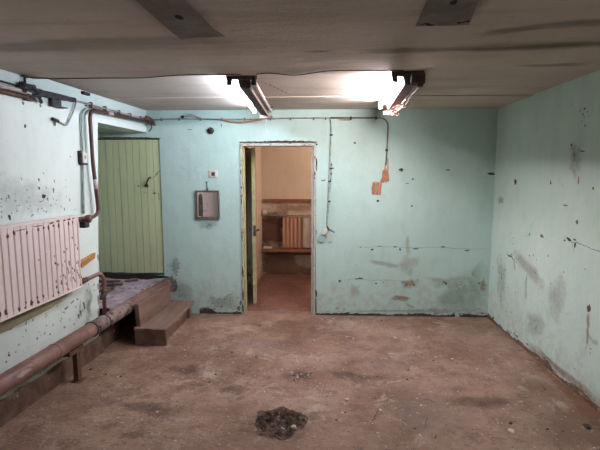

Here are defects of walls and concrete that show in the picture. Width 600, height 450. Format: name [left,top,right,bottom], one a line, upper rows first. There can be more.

flaking render [370,158,390,197]